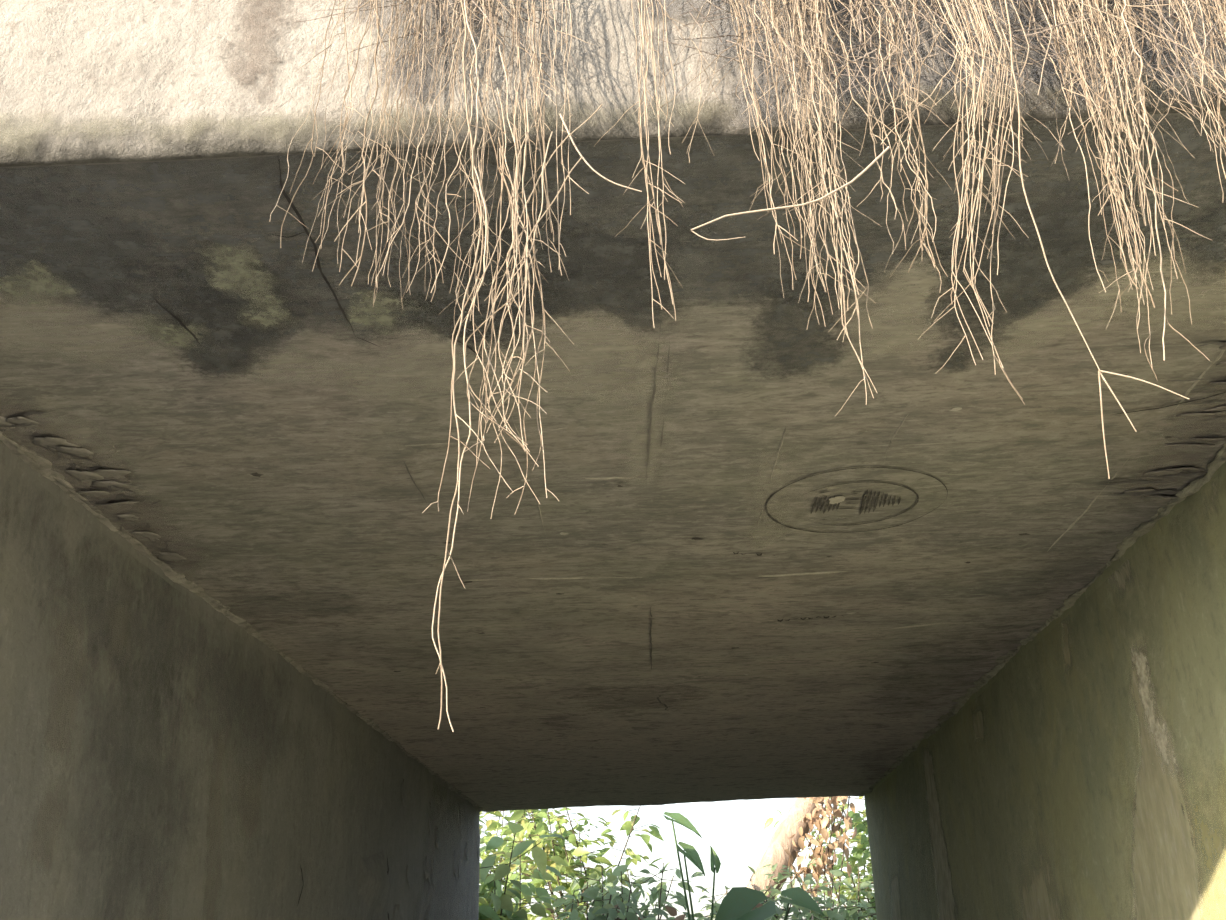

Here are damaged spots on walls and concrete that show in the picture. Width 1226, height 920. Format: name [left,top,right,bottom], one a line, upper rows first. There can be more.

crack [271,156,377,346]
damp [0,113,1226,480]
peeling [0,407,199,567]